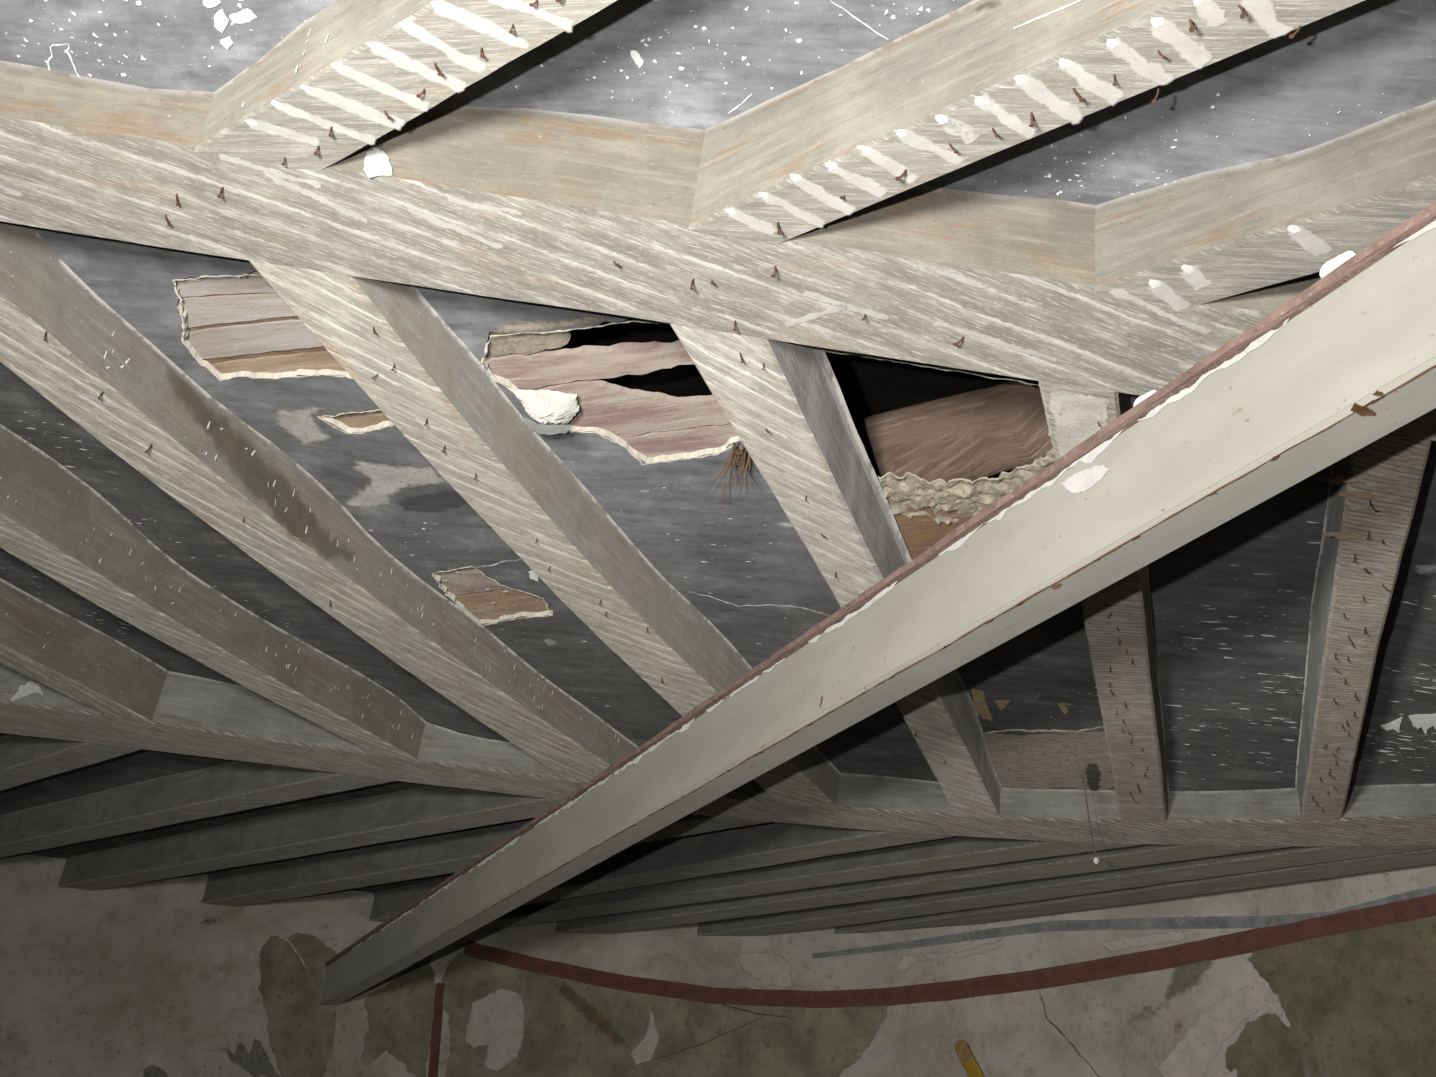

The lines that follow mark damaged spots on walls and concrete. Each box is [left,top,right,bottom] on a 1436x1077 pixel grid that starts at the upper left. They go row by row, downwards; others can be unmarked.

flaking render [172,271,353,381]
peeling [275,407,394,445]
flaking render [481,317,741,465]
flaking render [894,319,1289,560]
flaking render [401,522,553,648]
peeling [808,581,897,643]
peeling [535,658,785,827]
peeling [1362,664,1436,771]
peeling [227,836,520,1077]
peeling [358,950,888,1077]
crack [1039,991,1100,1077]
peeling [1157,916,1436,1077]